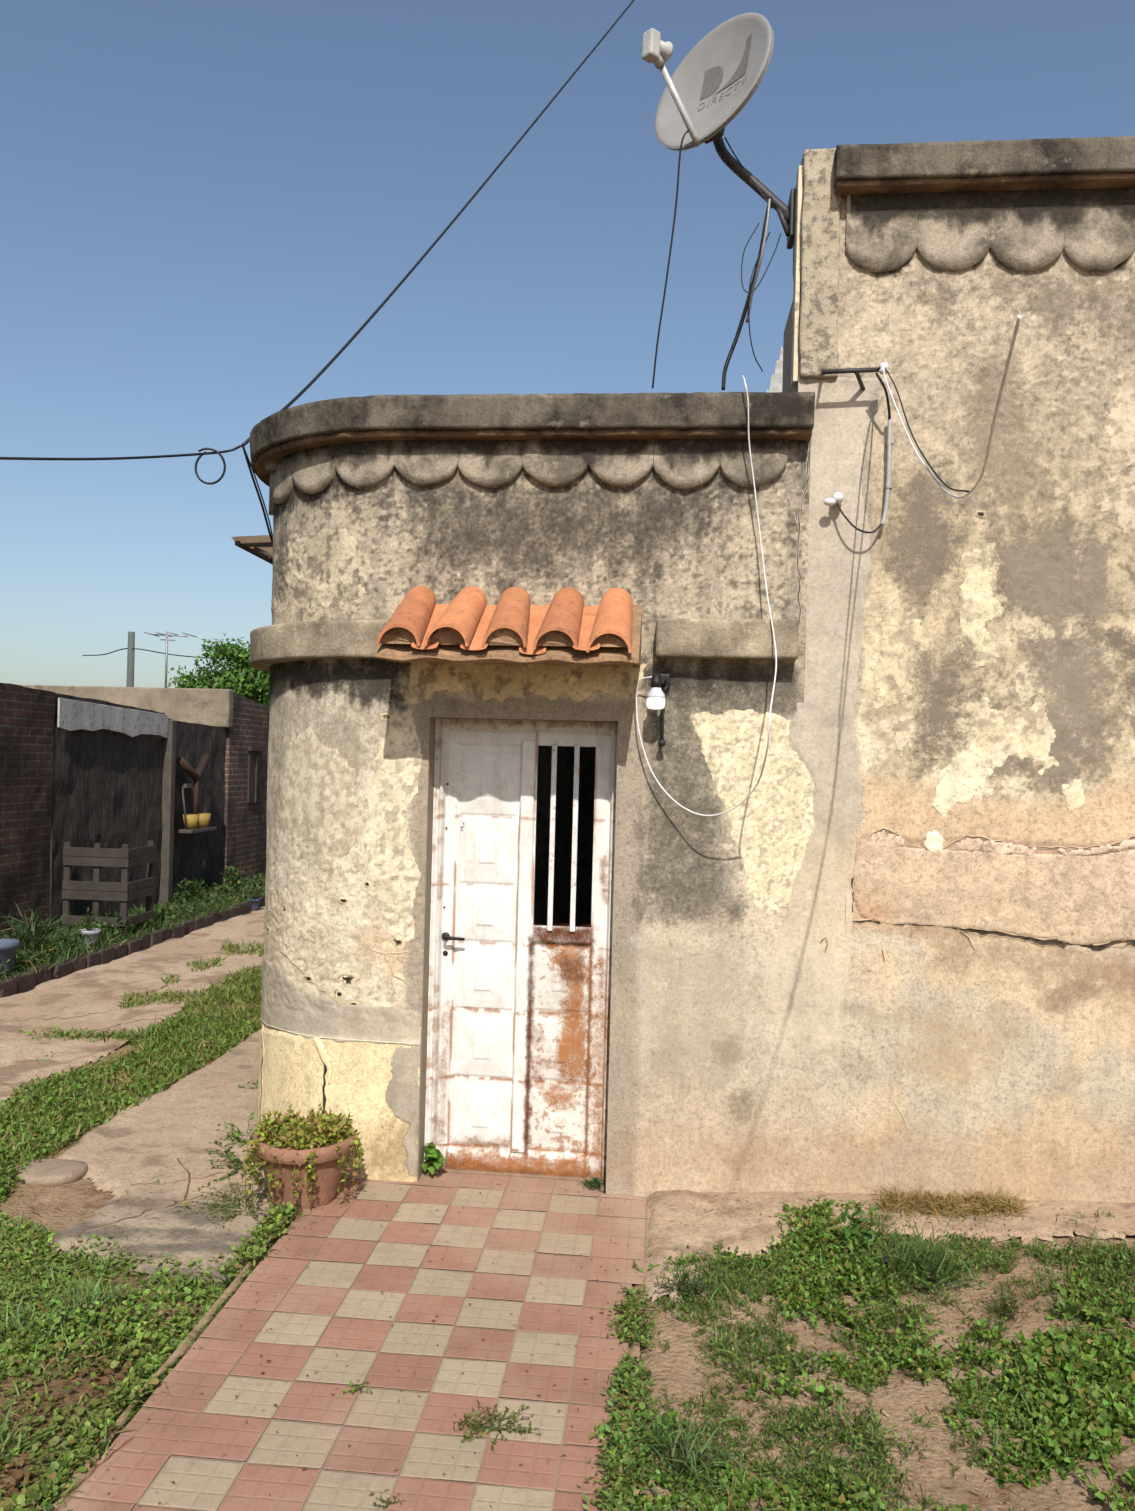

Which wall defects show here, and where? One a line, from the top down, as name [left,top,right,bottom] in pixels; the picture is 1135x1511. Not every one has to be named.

peeling [690,709,815,917]
flaking render [950,838,1037,856]
flaking render [1056,839,1135,857]
corrosion [438,925,611,1177]